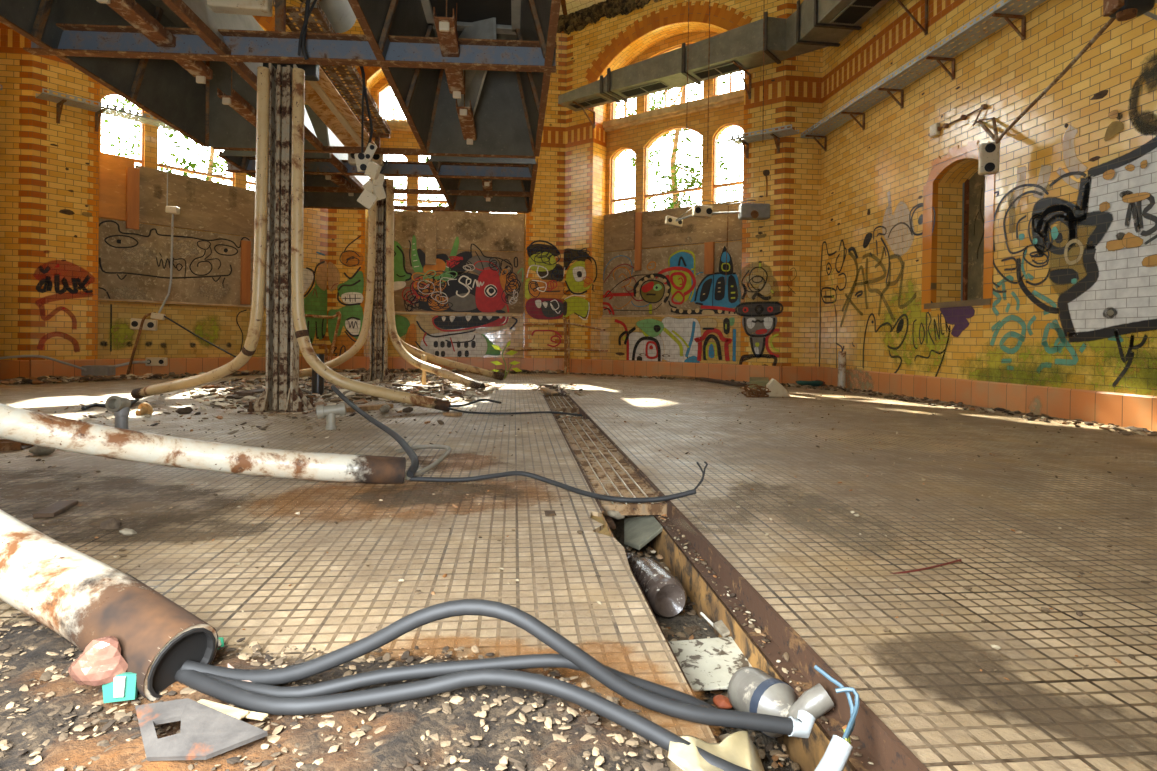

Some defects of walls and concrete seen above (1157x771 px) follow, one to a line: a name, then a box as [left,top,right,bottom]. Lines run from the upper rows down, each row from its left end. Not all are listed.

peeling [1089,156,1148,180]
peeling [1099,191,1150,212]
peeling [1106,232,1157,267]